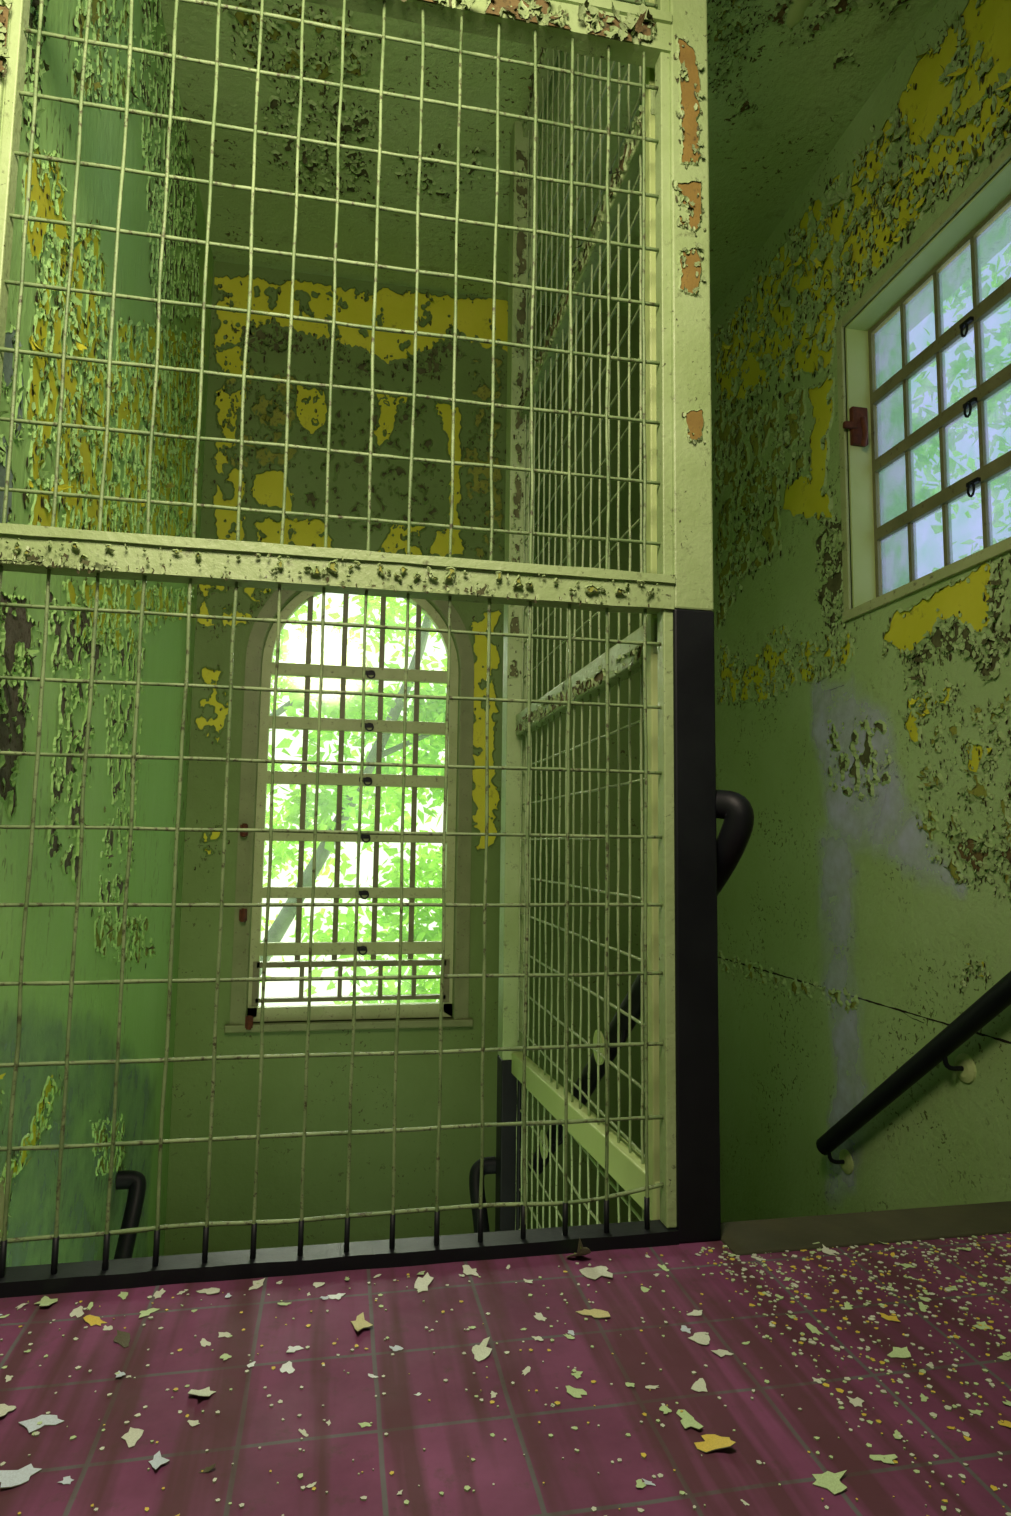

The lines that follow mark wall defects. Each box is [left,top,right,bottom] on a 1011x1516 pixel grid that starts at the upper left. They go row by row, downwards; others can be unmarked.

peeling [0,0,659,972]
peeling [672,0,1011,709]
leakage [814,709,918,928]
peeling [822,553,1011,910]
peeling [0,1074,63,1239]
peeling [89,1108,126,1180]